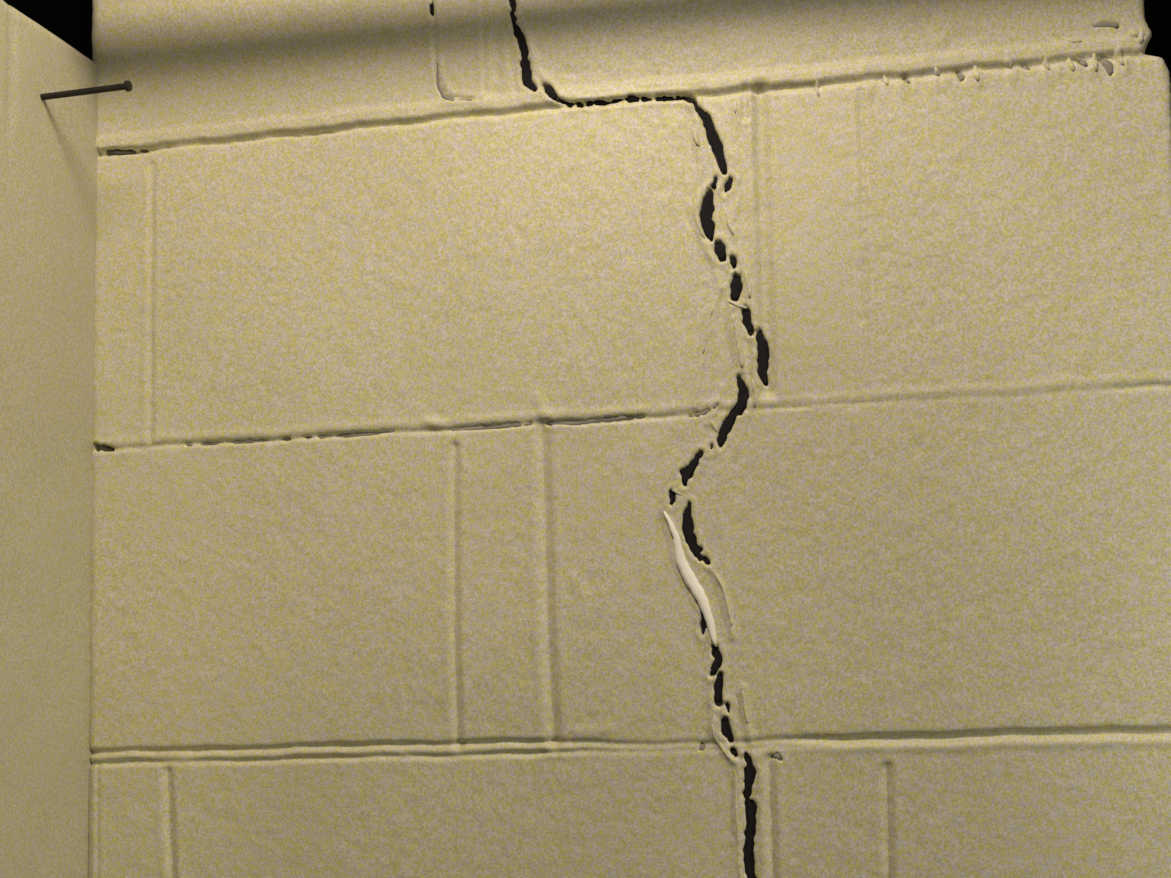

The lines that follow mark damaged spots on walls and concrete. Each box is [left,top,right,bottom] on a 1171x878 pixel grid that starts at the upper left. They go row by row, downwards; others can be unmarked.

crack [427,0,435,16]
crack [436,62,472,101]
crack [448,415,644,431]
crack [187,431,393,446]
crack [509,0,769,878]